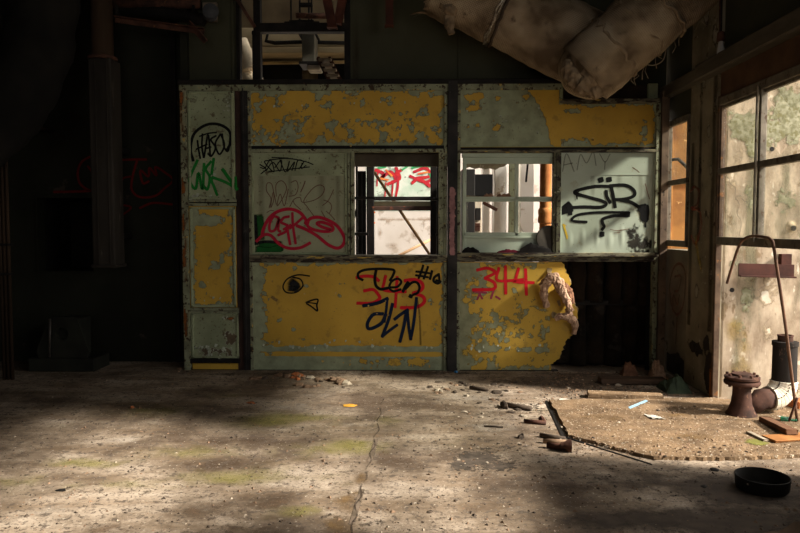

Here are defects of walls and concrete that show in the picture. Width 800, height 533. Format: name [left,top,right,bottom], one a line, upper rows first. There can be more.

peeling [251,90,444,147]
peeling [461,90,656,147]
peeling [188,193,234,305]
peeling [253,262,444,370]
peeling [459,263,570,370]
crack [340,399,400,533]